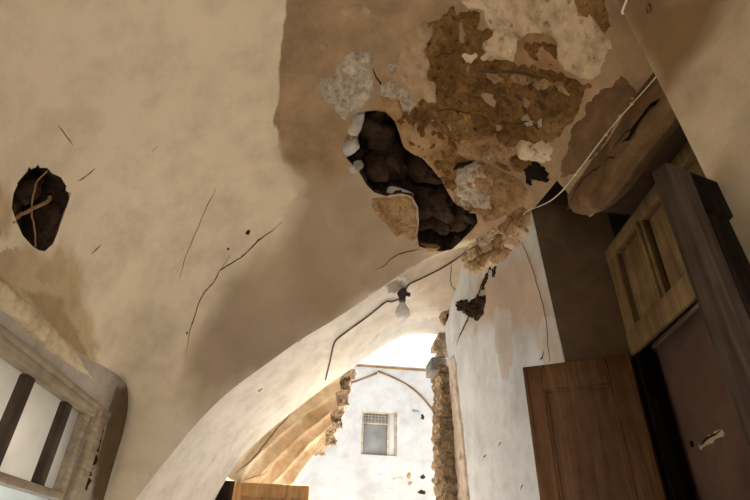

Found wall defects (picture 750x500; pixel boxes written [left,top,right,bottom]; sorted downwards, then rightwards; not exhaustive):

peeling [255,0,653,277]
crack [570,98,660,202]
crack [179,189,216,279]
crack [187,222,282,347]
peeling [431,294,486,500]